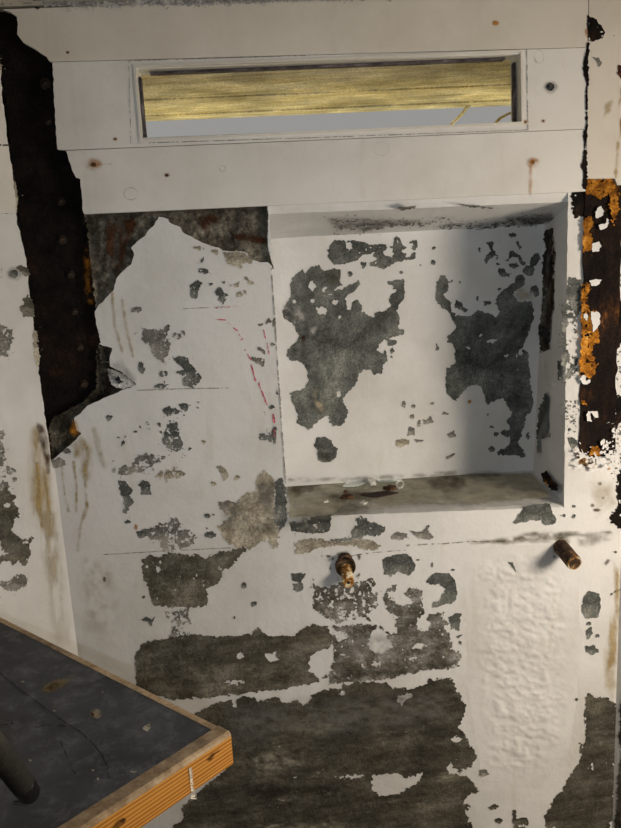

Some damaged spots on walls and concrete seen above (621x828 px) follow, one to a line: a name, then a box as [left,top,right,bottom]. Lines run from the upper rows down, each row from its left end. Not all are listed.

spalling [84,206,274,308]
corrosion [582,216,593,251]
corrosion [585,170,621,226]
peeling [258,206,582,458]
corrosion [577,282,604,378]
spalling [44,334,136,468]
peeling [561,298,621,529]
peeling [0,429,34,598]
peeling [513,503,576,525]
peeling [112,401,489,828]
peeling [582,591,601,655]
peeling [544,693,621,828]